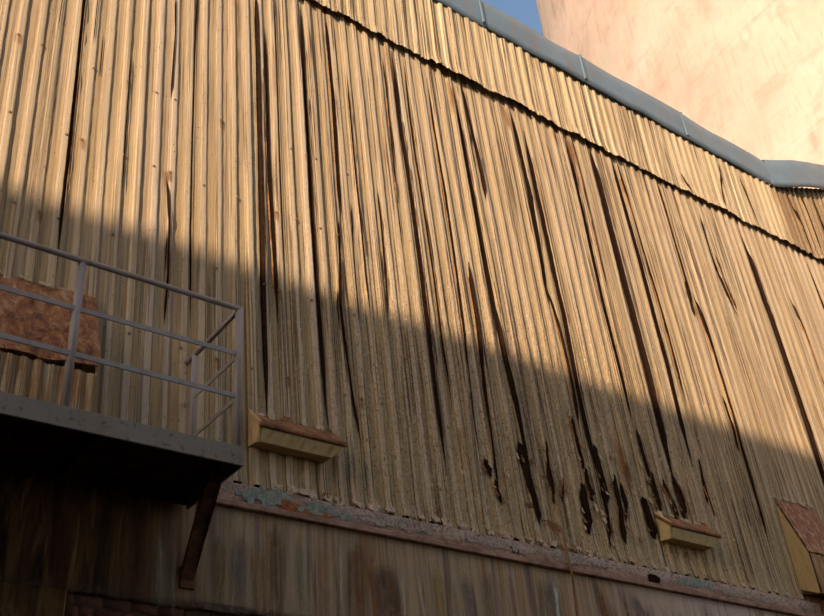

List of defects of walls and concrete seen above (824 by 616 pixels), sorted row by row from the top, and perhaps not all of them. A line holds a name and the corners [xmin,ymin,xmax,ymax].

peeling [236,483,635,564]